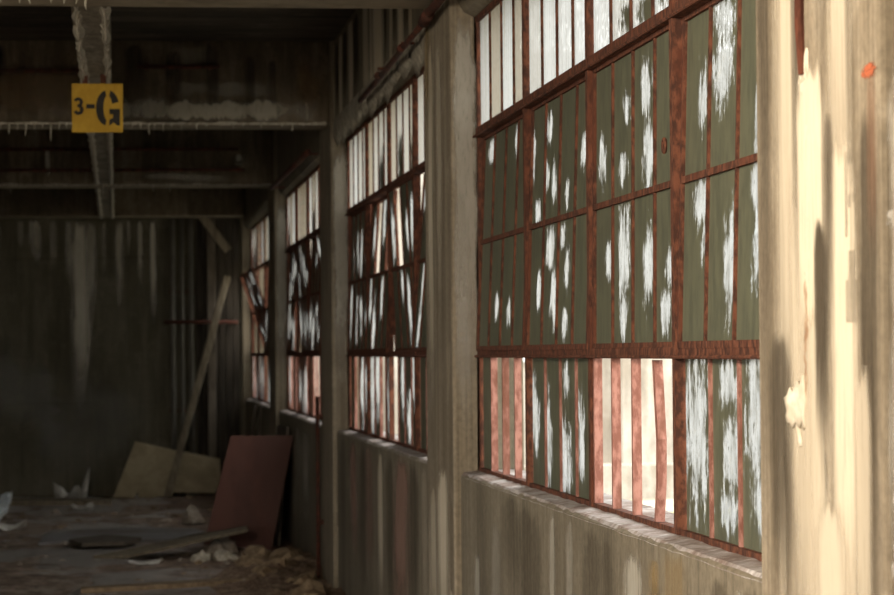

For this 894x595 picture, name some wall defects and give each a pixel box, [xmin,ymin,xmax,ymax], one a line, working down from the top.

leakage [99,7,112,84]
leakage [123,8,412,125]
leakage [758,0,766,175]
rust [861,62,876,79]
leakage [66,221,96,377]
leakage [0,133,271,285]
leakage [138,221,156,299]
leakage [428,49,441,317]
leakage [771,0,876,595]
leakage [431,472,448,595]
leakage [627,556,642,595]